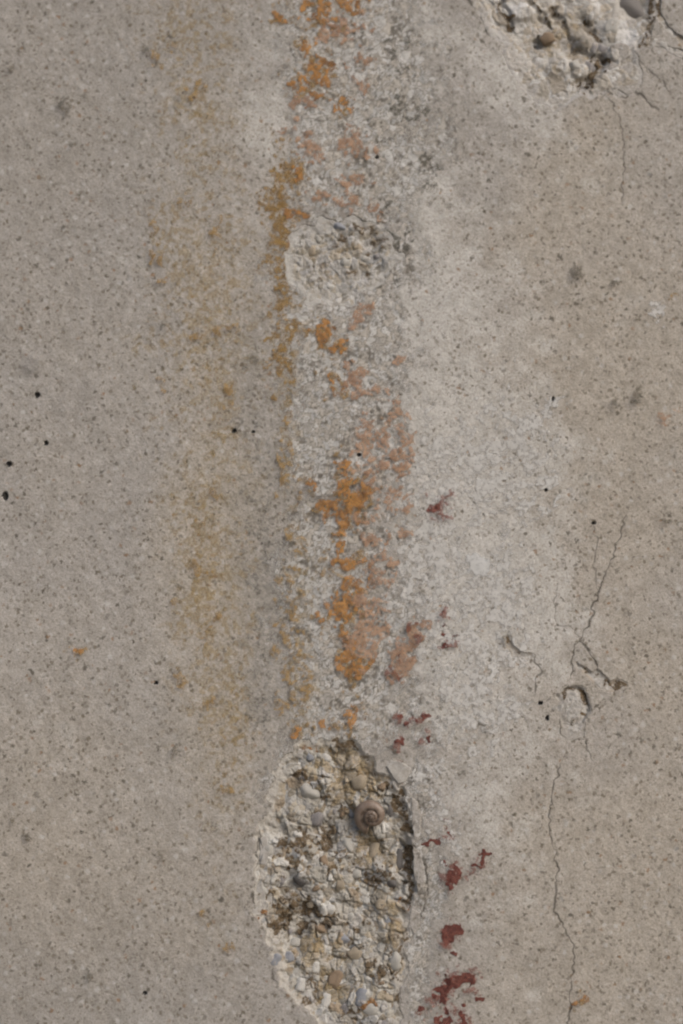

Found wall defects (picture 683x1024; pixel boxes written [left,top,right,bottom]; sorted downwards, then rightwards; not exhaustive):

spalling [473,0,683,113]
rust [256,0,433,740]
spalling [251,0,492,1024]
crack [570,527,622,677]
crack [548,762,575,1024]